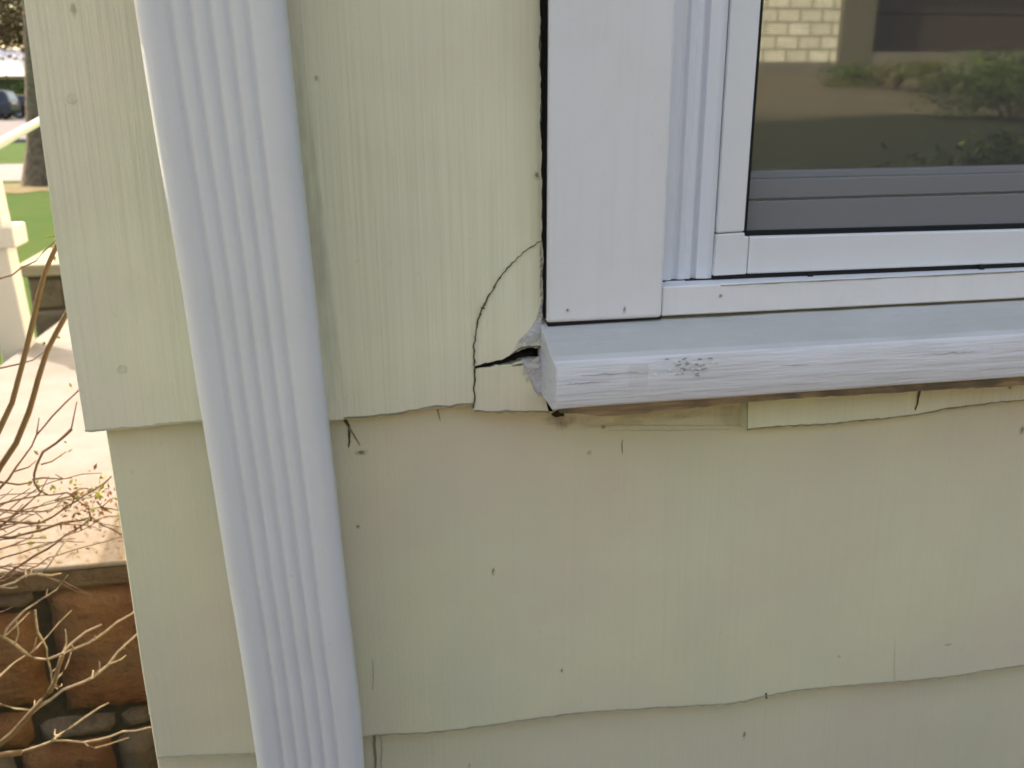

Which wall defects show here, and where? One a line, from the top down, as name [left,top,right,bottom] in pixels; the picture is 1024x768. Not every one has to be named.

crack [472,241,541,408]